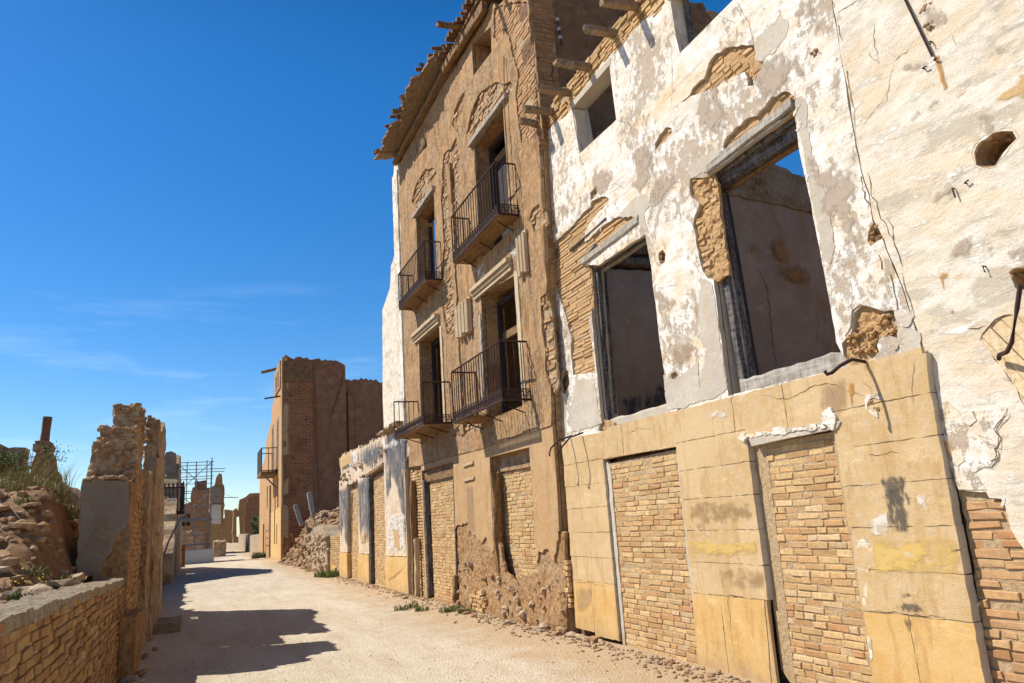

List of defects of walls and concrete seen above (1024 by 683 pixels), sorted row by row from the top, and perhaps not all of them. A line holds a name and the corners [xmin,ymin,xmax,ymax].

crack [847,30,913,139]
spalling [972,115,1018,169]
flaking render [541,128,675,433]
flaking render [624,4,886,414]
flaking render [845,306,922,367]
crack [861,174,914,320]
peeling [339,435,406,553]